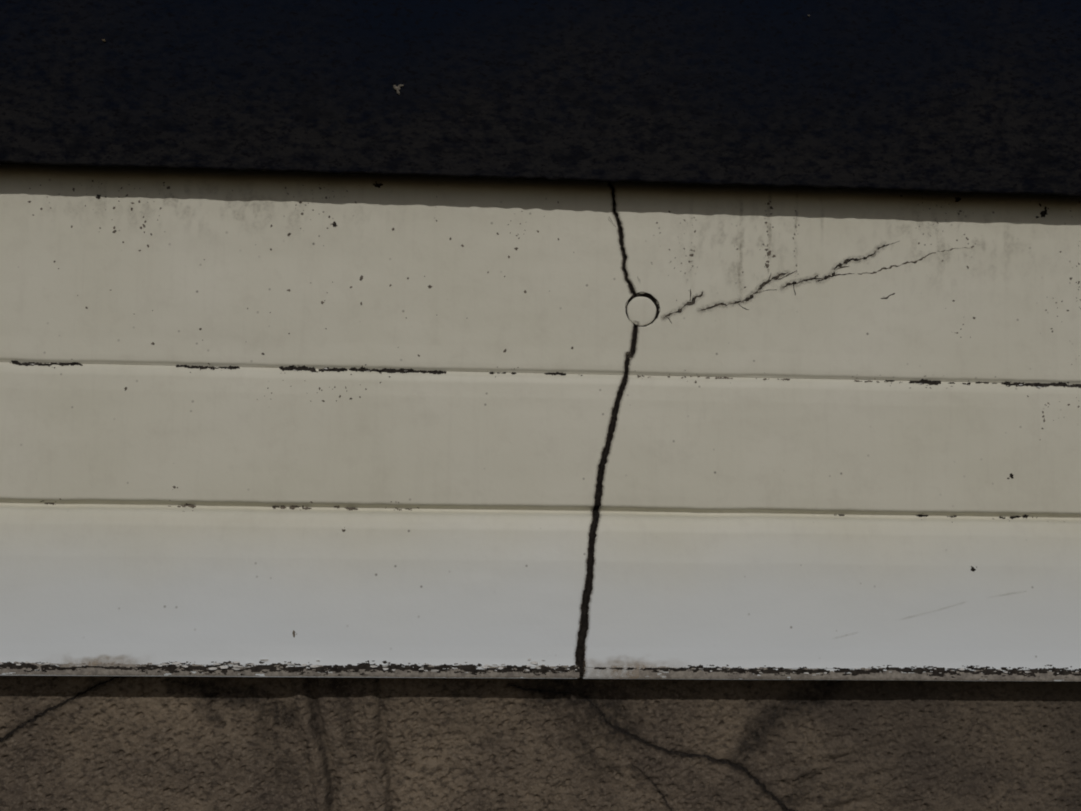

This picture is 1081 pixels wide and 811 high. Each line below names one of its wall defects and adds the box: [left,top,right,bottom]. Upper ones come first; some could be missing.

crack [510,182,966,811]
peeling [0,659,580,678]
peeling [594,664,1081,681]